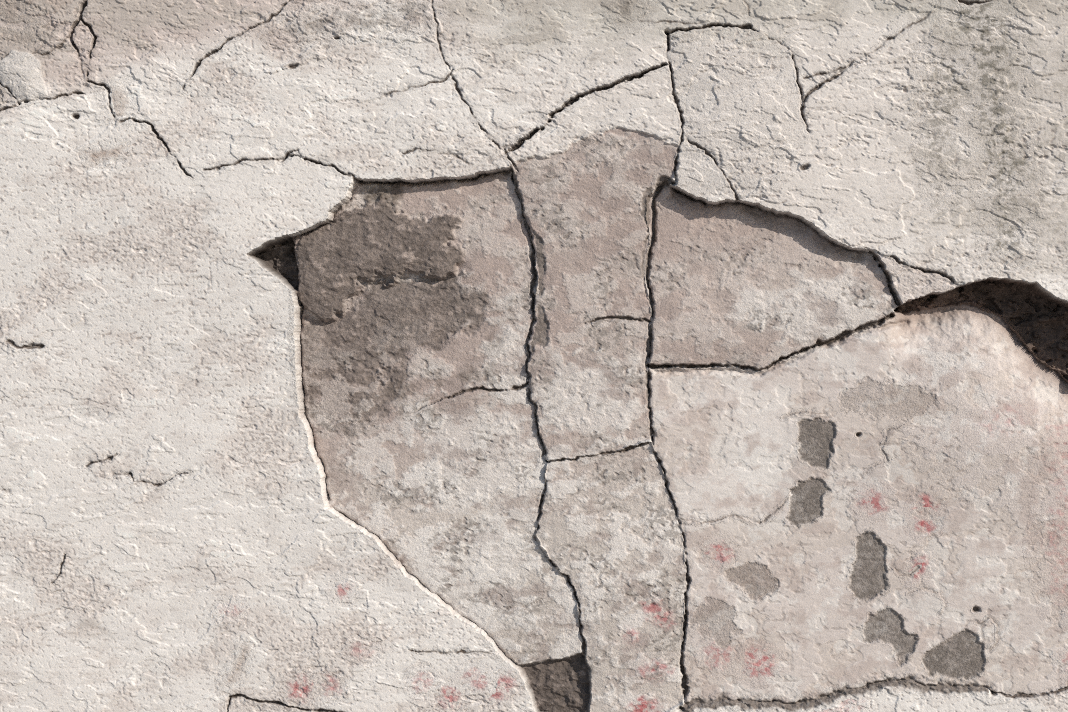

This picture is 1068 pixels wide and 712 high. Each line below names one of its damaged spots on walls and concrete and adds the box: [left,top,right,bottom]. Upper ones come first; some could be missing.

crack [0,0,364,186]
water stain [360,172,415,213]
spalling [261,124,954,648]
crack [379,0,1068,712]
water stain [695,530,741,576]
water stain [846,480,947,590]
peeling [846,527,1001,681]
crack [224,691,346,712]
spalling [590,684,627,712]